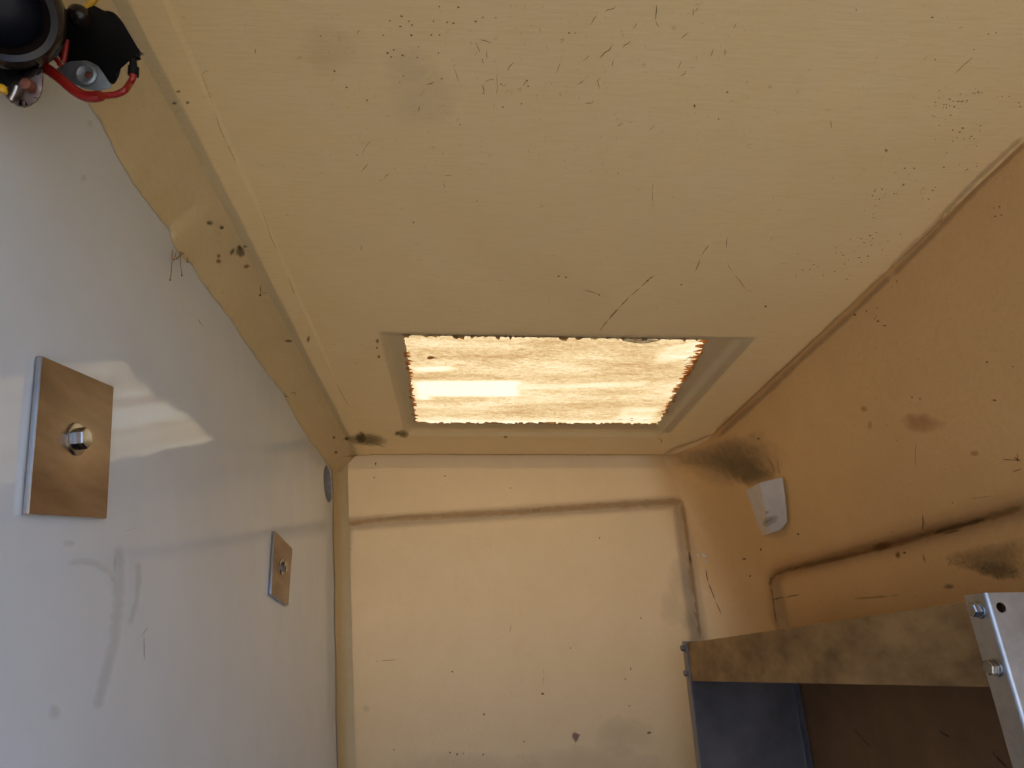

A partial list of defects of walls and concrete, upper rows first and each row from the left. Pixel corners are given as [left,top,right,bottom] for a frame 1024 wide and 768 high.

water stain [333,433,383,447]